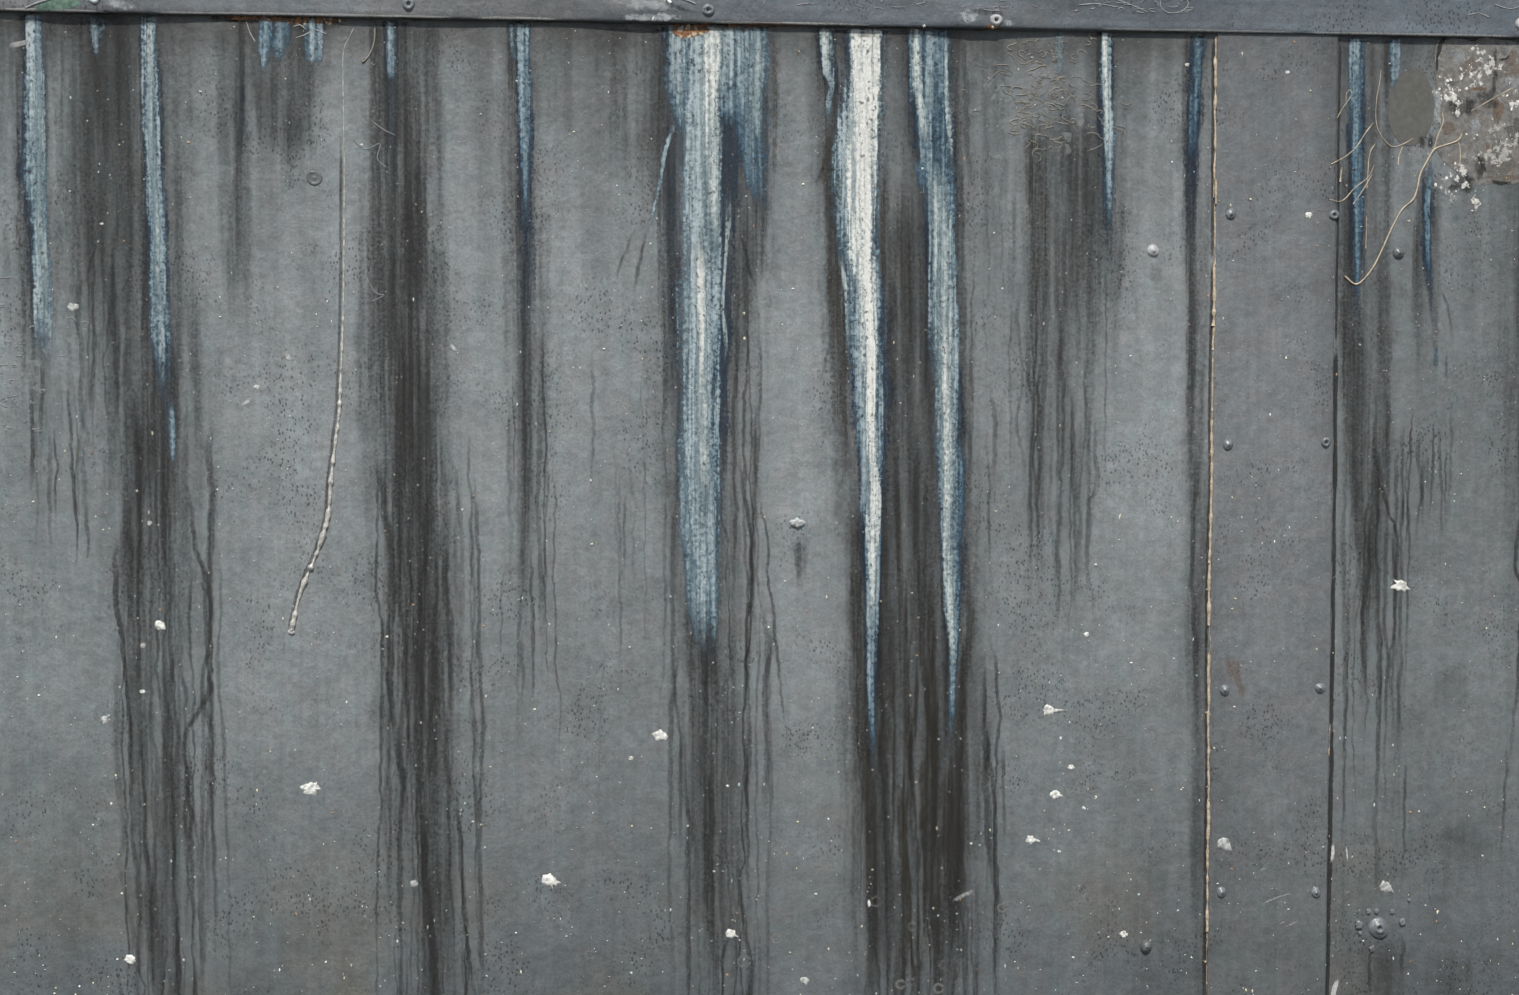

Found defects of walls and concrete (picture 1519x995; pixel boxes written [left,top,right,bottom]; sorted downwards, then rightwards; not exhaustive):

water stain [16,15,53,341]
water stain [113,562,147,865]
water stain [87,16,196,539]
water stain [370,21,452,799]
water stain [398,820,470,995]
water stain [507,23,545,489]
water stain [650,25,777,983]
water stain [815,29,974,995]
water stain [1029,33,1117,305]
water stain [1337,38,1404,624]
water stain [1416,176,1434,300]
peeling [1388,37,1519,211]